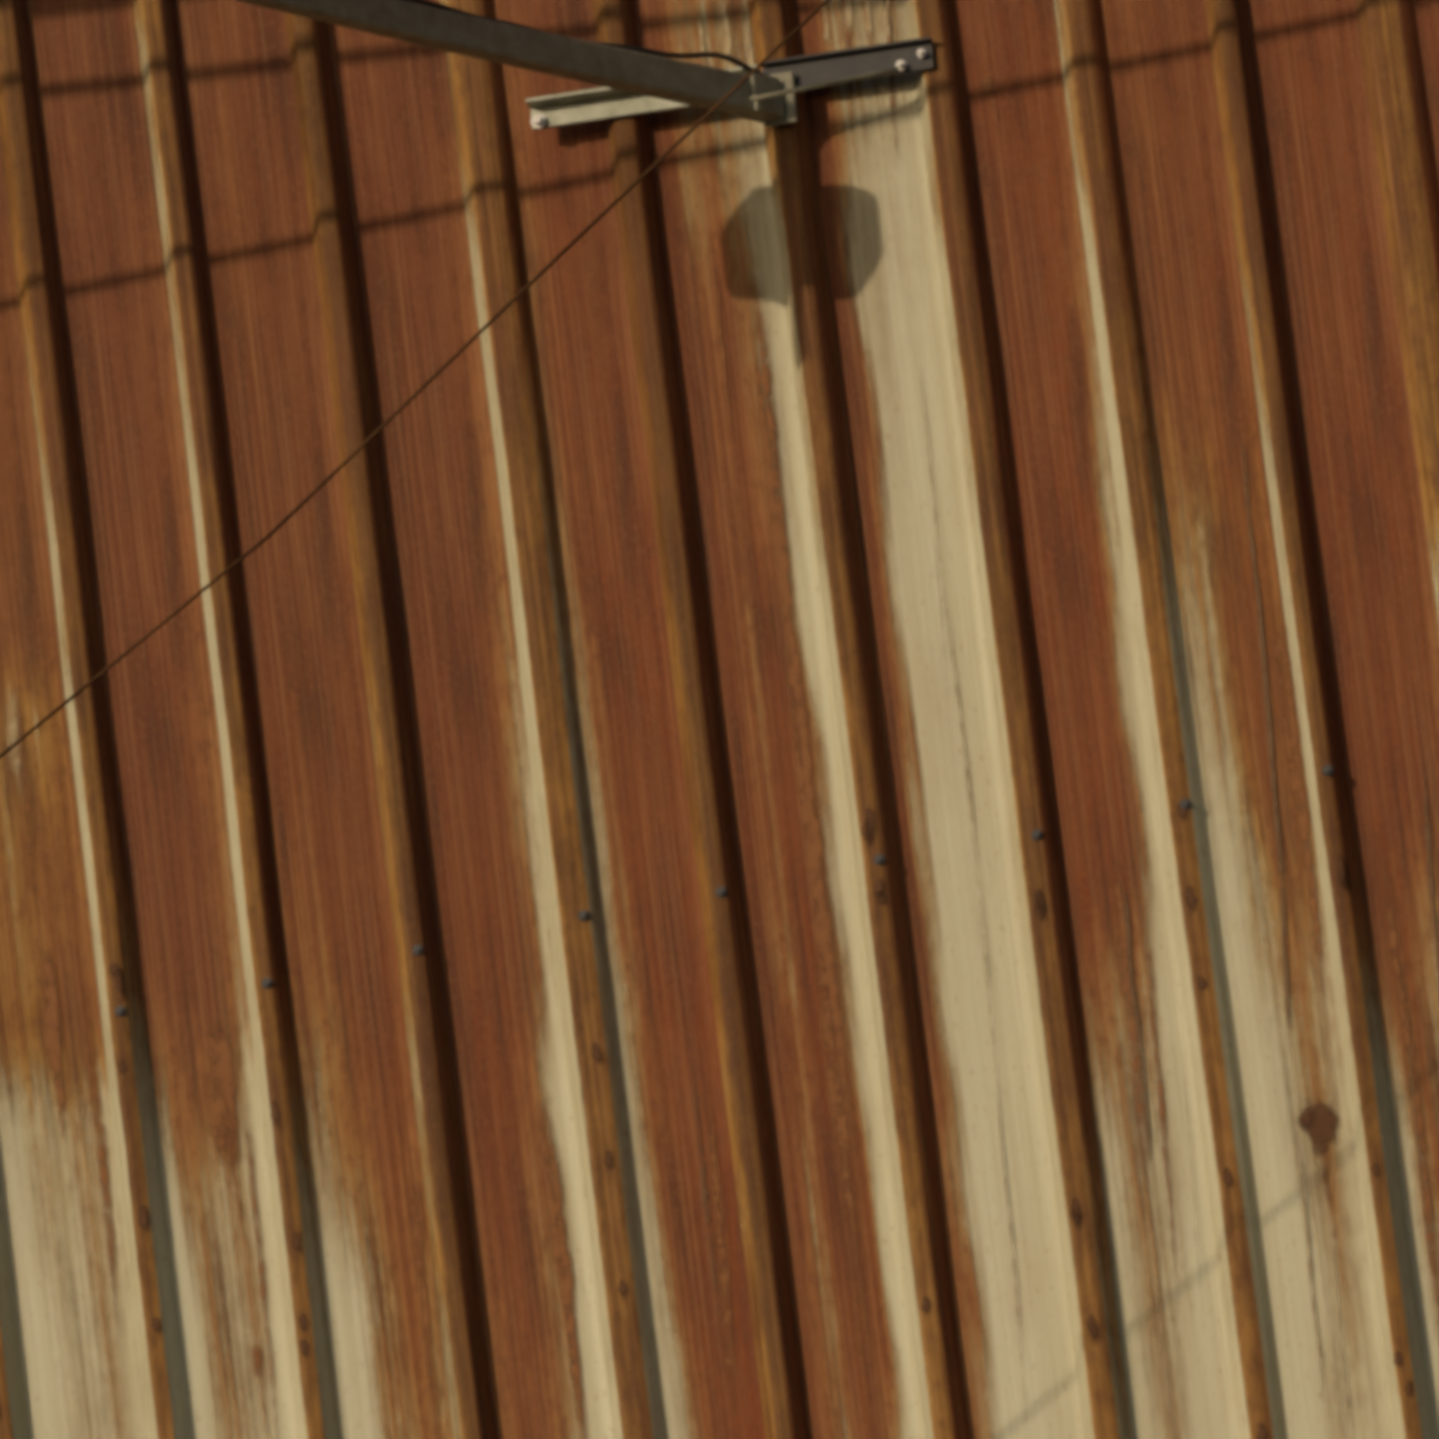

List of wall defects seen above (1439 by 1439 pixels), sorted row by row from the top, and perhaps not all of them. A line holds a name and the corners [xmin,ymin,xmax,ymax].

rust [0,0,993,1439]
rust [422,0,1439,1439]